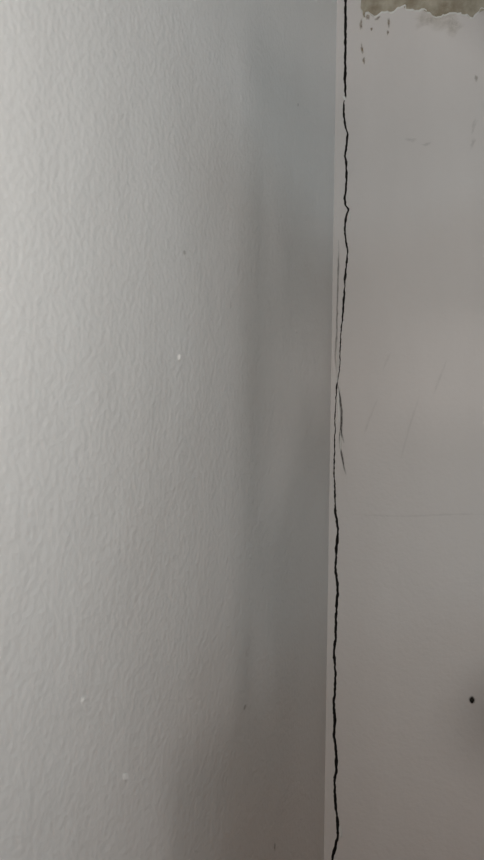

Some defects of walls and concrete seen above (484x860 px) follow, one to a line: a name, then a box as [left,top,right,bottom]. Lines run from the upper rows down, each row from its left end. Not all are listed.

crack [331,0,350,860]